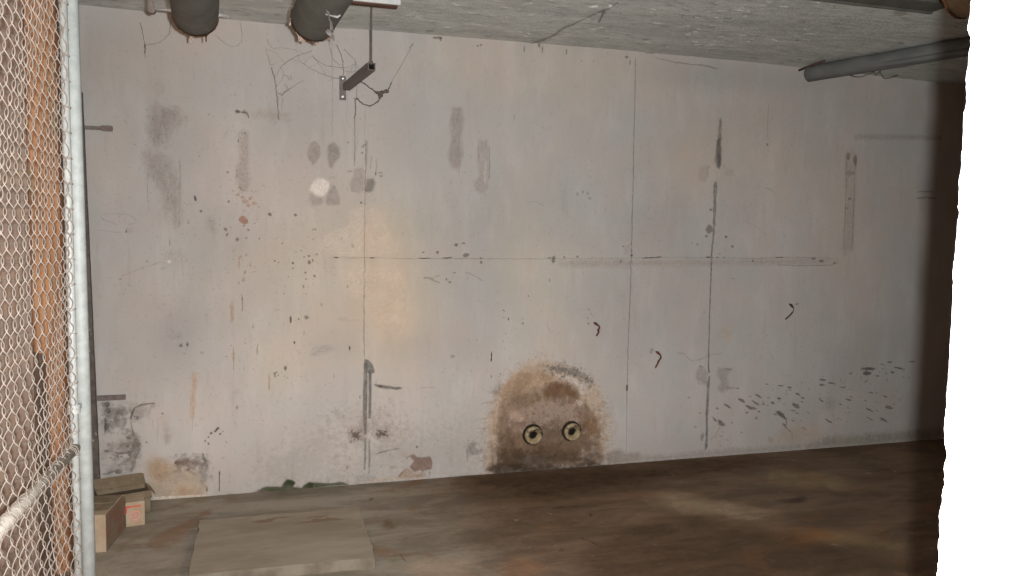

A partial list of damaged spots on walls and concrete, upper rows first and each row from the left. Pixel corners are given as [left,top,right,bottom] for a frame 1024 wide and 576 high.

leakage [487,366,735,495]